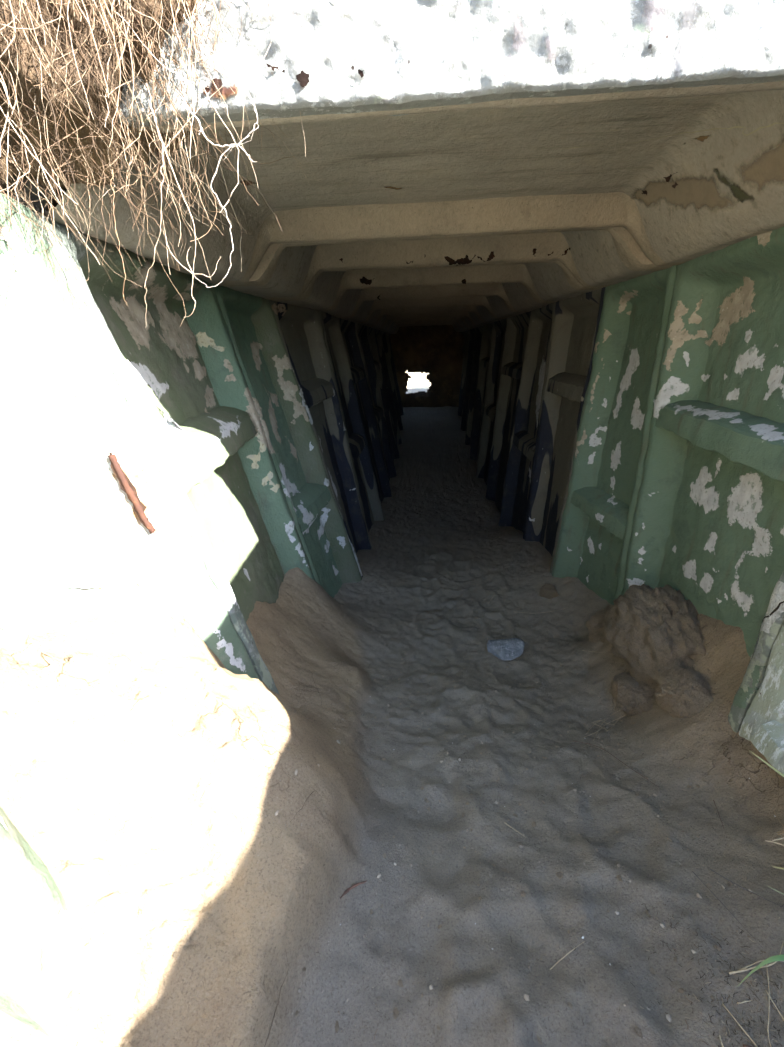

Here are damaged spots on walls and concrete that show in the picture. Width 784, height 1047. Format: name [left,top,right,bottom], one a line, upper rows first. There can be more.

hole [445,251,495,265]
peeling [103,259,363,576]
peeling [575,276,784,506]
spalling [61,372,240,609]
peeling [567,538,602,565]
peeling [626,522,646,586]
peeling [682,458,784,617]
peeling [207,622,246,672]
spalling [750,580,784,660]